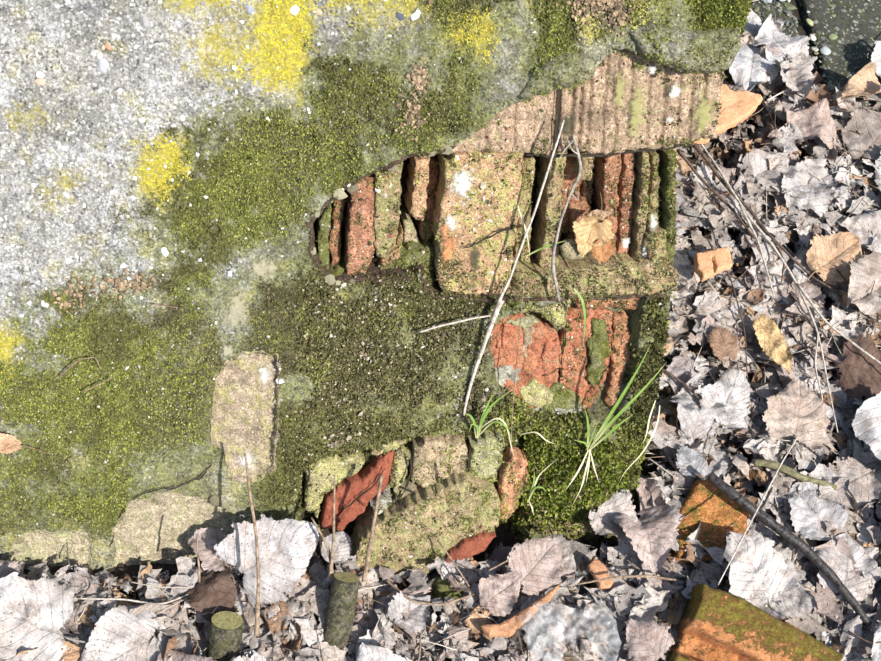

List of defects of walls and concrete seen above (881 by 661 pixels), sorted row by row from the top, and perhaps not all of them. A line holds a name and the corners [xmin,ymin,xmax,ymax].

spalling [306,144,581,412]
spalling [586,317,611,390]
spalling [320,450,395,531]
spalling [444,530,496,563]